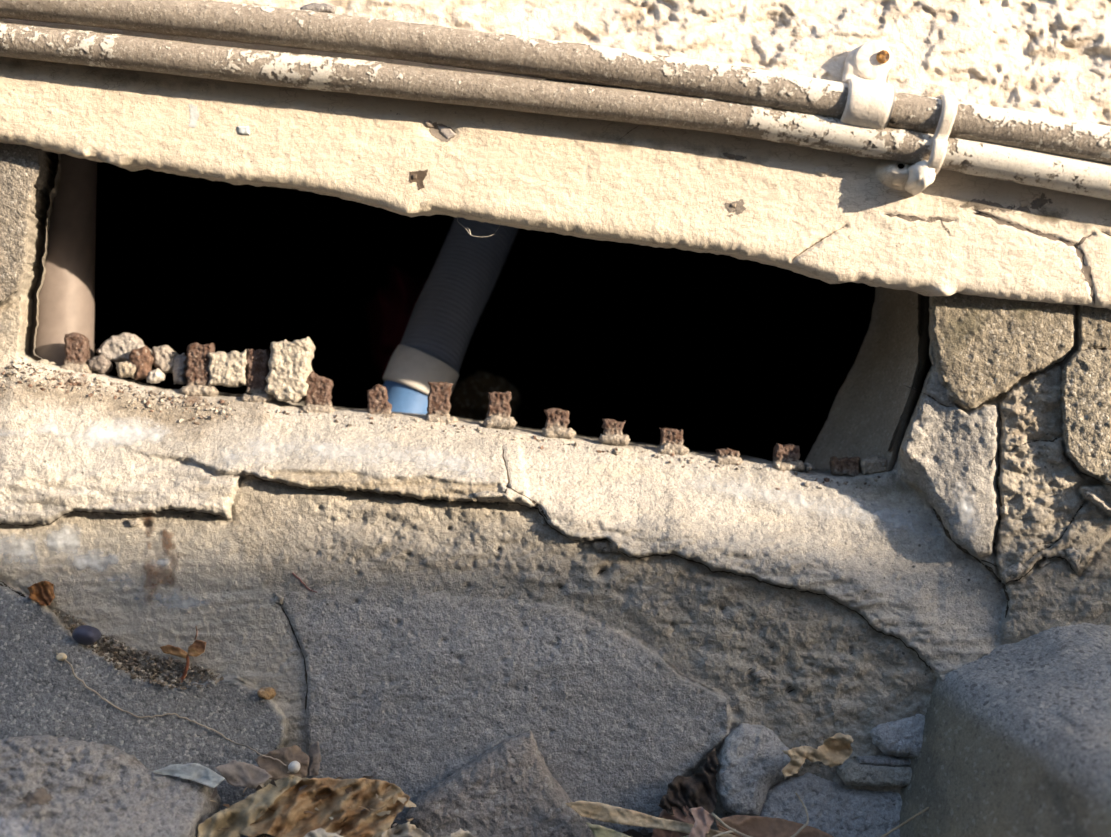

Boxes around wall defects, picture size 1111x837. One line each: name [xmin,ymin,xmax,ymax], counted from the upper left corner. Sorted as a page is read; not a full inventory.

peeling [230,2,345,28]
peeling [0,22,122,68]
peeling [212,47,429,95]
peeling [469,34,942,162]
peeling [237,126,250,135]
peeling [424,121,457,142]
peeling [409,170,428,190]
peeling [944,101,1111,213]
crack [886,208,1111,304]
crack [503,449,548,520]